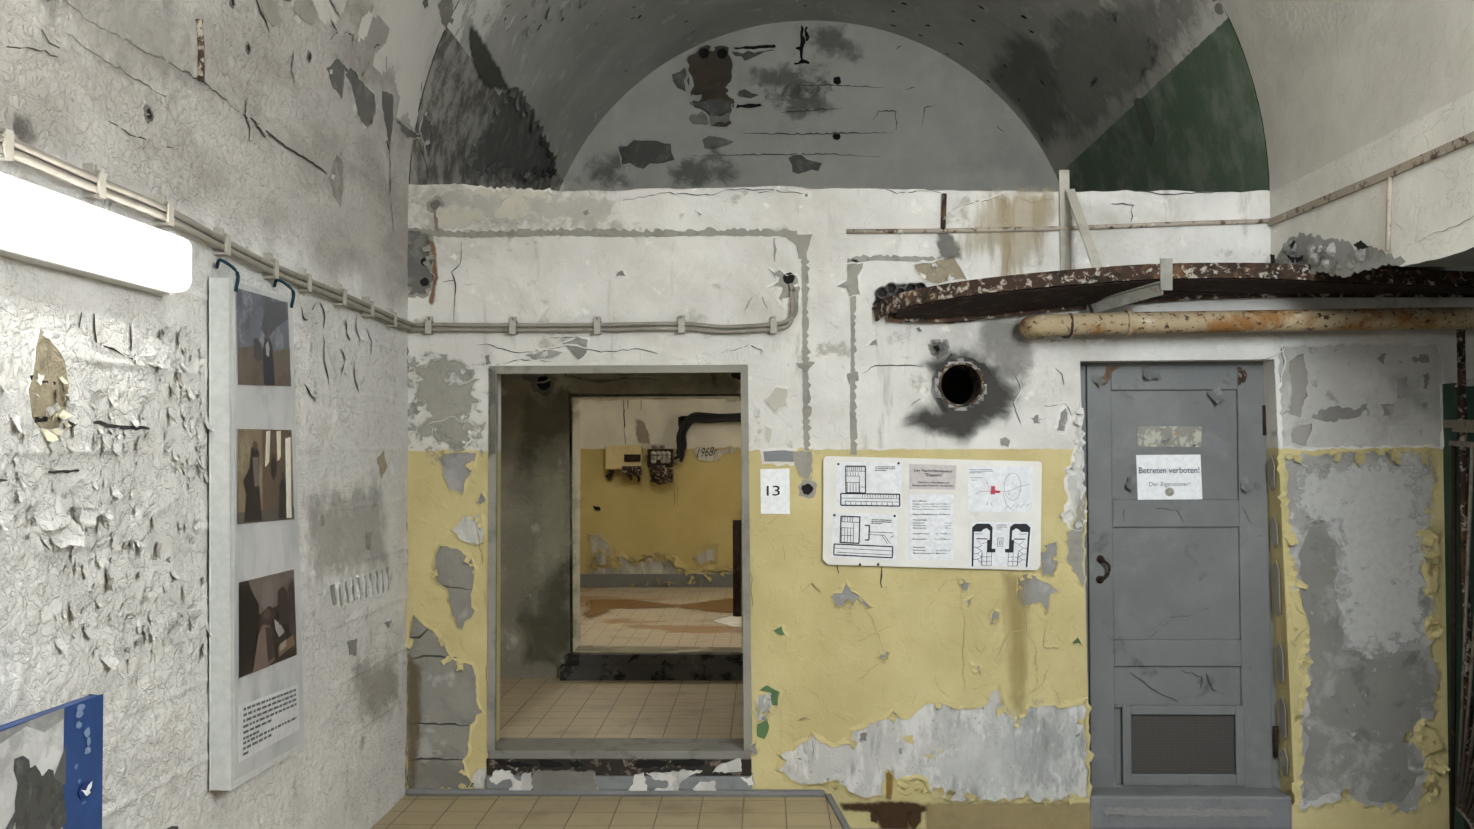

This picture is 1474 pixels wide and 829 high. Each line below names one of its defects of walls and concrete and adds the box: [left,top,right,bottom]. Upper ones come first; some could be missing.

peeling [325,58,437,165]
peeling [615,136,677,174]
leakage [673,150,732,185]
spalling [667,20,777,155]
leakage [761,69,825,114]
leakage [817,29,855,57]
leakage [1055,0,1202,145]
leakage [942,319,1030,376]
spalling [0,322,214,670]
peeling [384,352,599,791]
peeling [1274,340,1451,818]
peeling [628,683,1095,805]